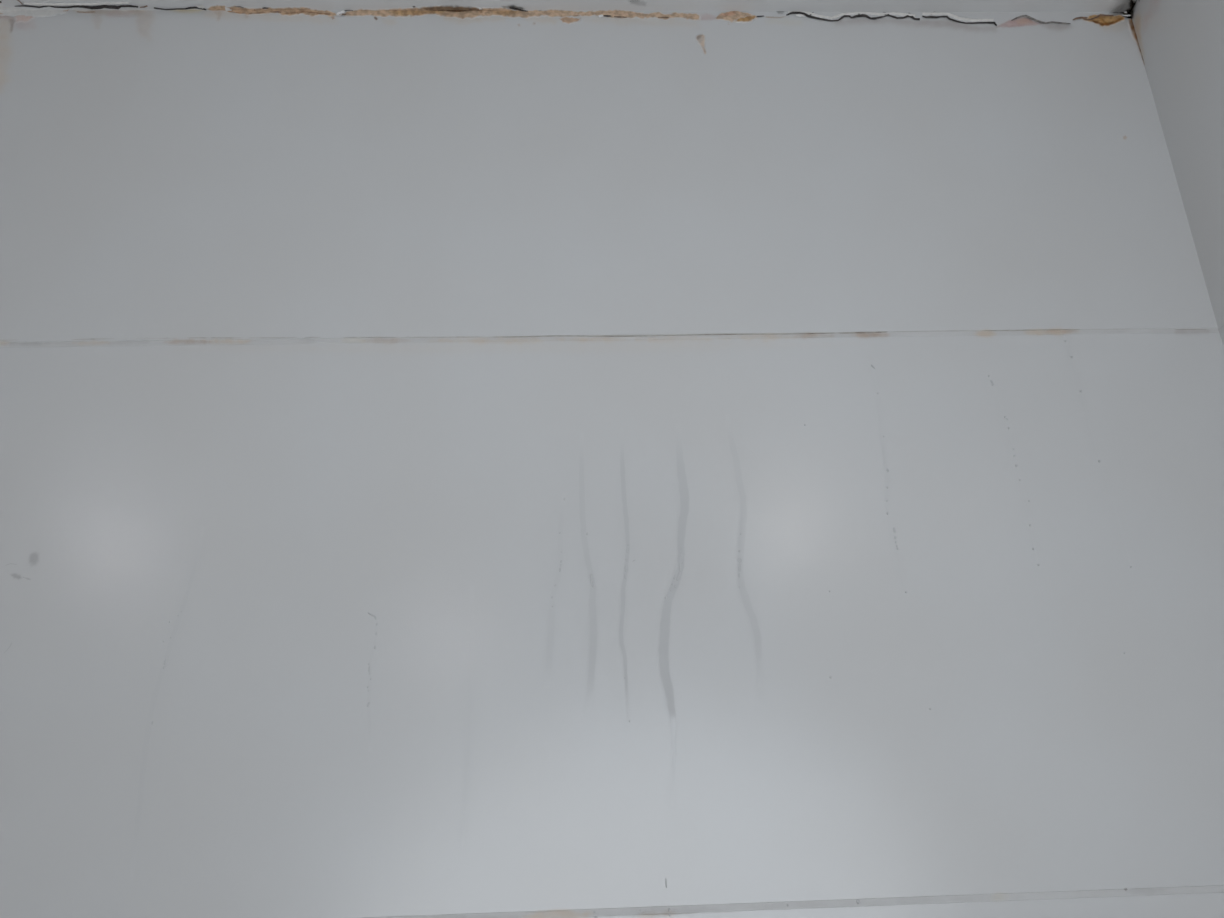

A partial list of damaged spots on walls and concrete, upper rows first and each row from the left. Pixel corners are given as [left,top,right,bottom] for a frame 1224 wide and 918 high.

crack [0,0,206,10]
crack [786,11,1088,26]
leakage [658,422,690,806]